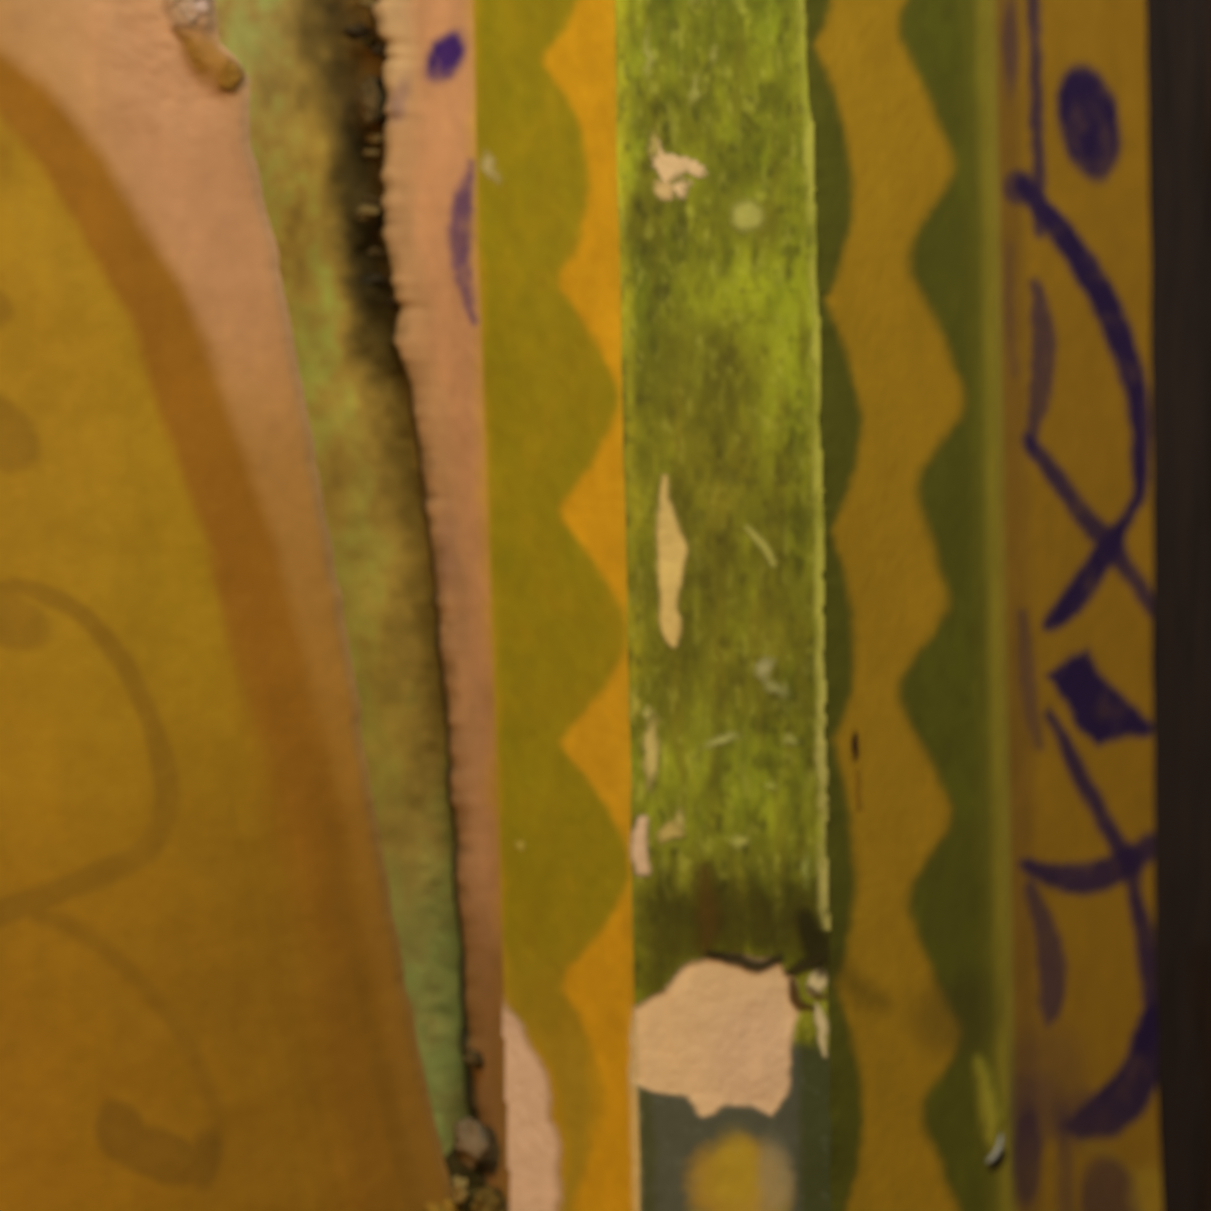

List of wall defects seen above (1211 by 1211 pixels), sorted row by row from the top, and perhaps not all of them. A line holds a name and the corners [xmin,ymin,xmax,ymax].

spalling [167,0,244,91]
peeling [650,137,706,199]
peeling [657,475,687,647]
peeling [425,1006,560,1211]
peeling [630,951,828,1116]